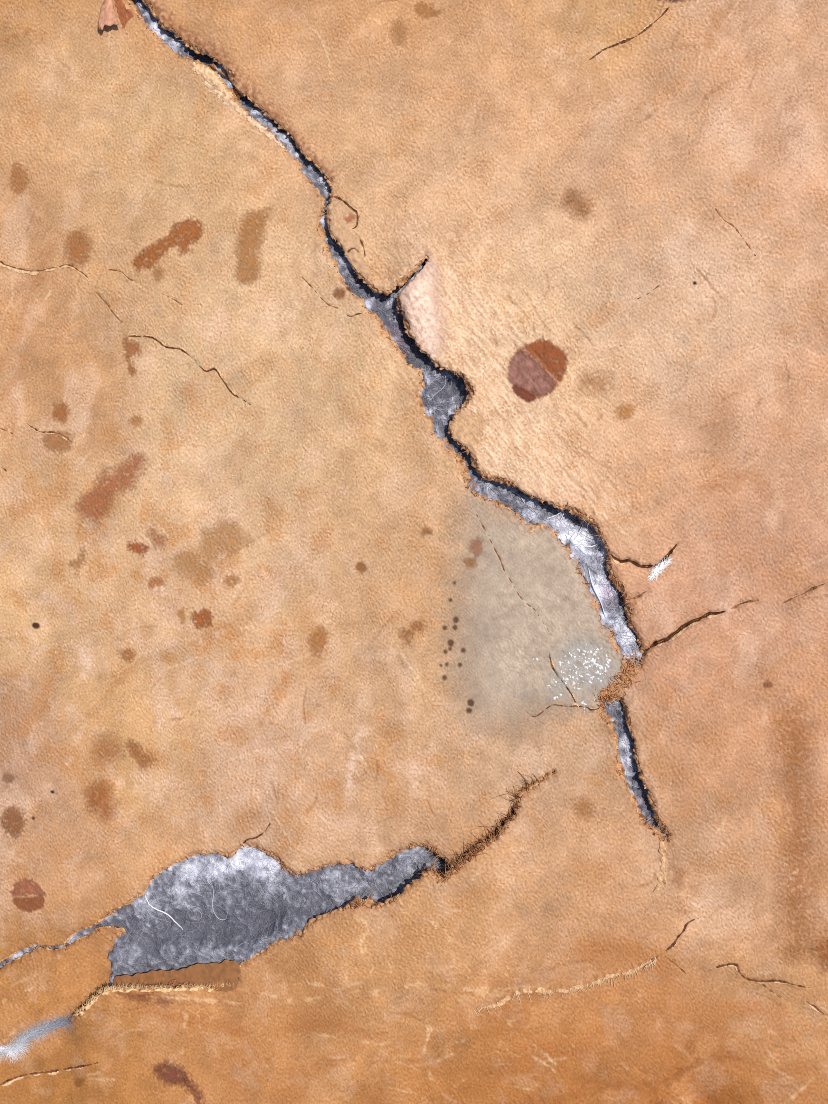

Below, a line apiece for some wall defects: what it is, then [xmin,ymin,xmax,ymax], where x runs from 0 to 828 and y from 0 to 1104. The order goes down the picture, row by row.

crack [590,1,674,60]
corrosion [134,219,202,269]
crack [333,196,366,256]
crack [0,261,251,405]
leakage [466,540,481,567]
crack [610,544,677,600]
crack [645,582,828,651]
leakage [440,617,465,680]
crack [532,656,599,717]
peeling [80,984,213,1016]
crack [473,919,695,1016]
crack [716,963,825,1015]